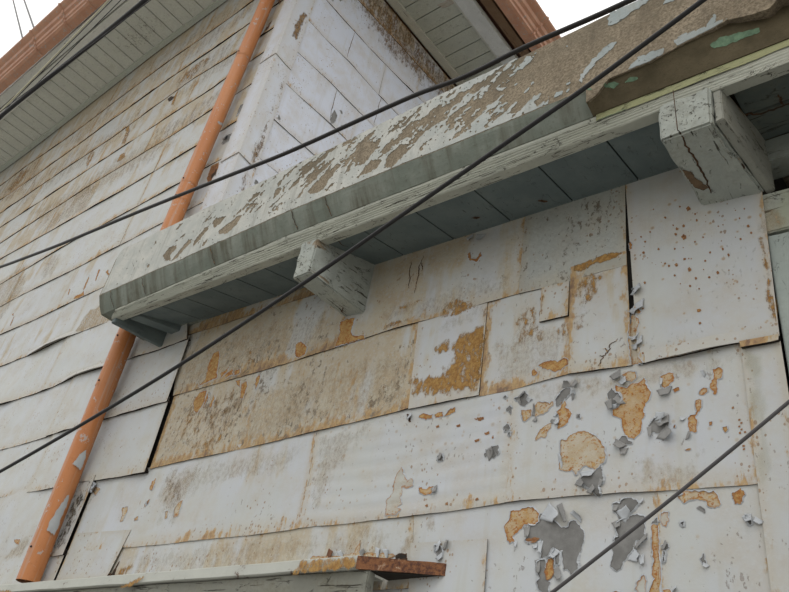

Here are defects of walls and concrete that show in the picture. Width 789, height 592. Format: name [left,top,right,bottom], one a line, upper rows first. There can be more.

peeling [607,0,648,26]
peeling [674,14,723,46]
peeling [101,42,617,294]
crack [673,91,712,193]
crack [408,256,424,293]
corrosion [572,242,633,304]
corrosion [766,279,777,318]
corrosion [170,350,261,451]
corrosion [409,326,488,395]
peeling [502,283,724,498]
peeling [503,502,585,592]
peeling [609,497,686,592]